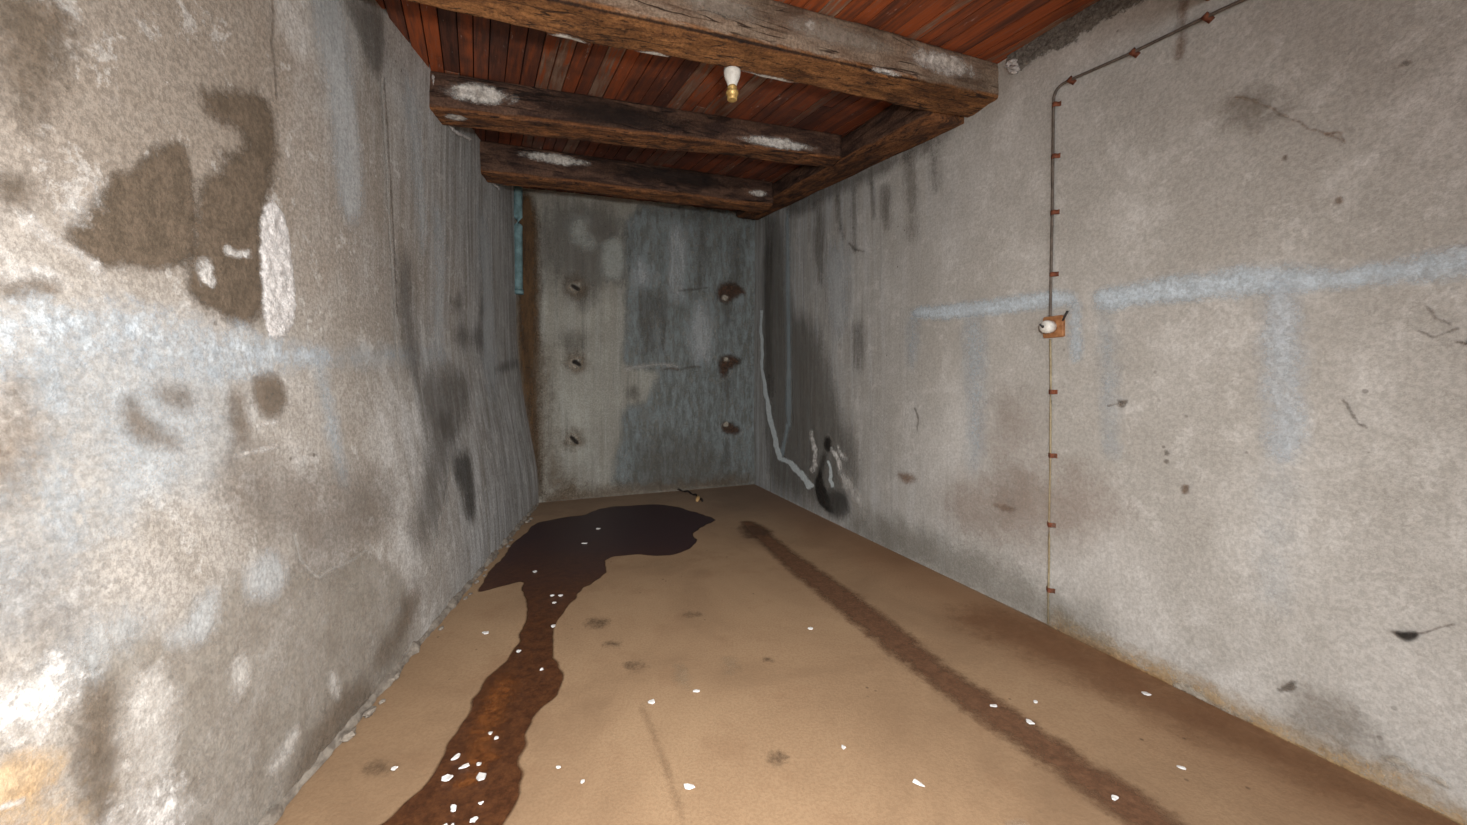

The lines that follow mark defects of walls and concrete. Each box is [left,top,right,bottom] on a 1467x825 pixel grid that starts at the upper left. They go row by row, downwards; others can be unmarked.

damp [67,87,278,326]
damp [315,0,360,217]
damp [235,378,285,431]
damp [381,206,867,825]
damp [742,521,1183,825]
crack [1394,631,1429,641]